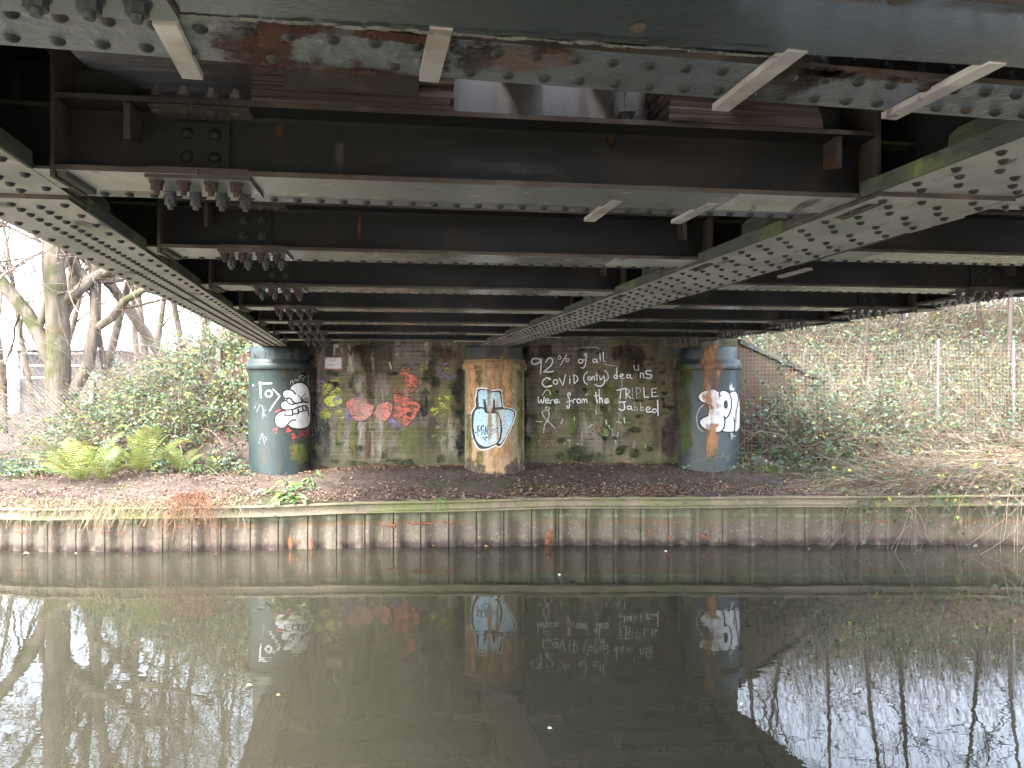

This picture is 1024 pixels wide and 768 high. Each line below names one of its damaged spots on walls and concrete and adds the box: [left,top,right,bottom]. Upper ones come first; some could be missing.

corrosion [211,21,333,72]
corrosion [350,30,427,61]
corrosion [442,39,491,72]
water stain [333,344,388,405]
water stain [612,344,654,378]
corrosion [701,345,723,457]
water stain [358,415,383,460]